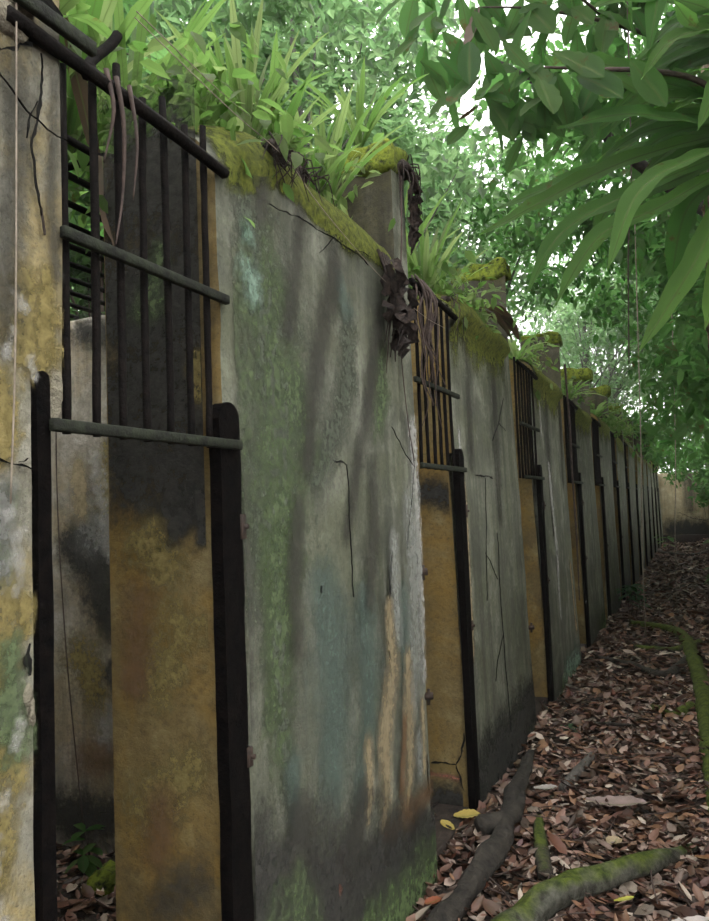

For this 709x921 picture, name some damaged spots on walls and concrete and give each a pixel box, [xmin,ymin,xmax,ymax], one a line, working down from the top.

leakage [0,57,30,346]
crack [0,53,68,235]
crack [333,460,354,597]
leakage [234,177,463,921]
crack [426,734,465,790]